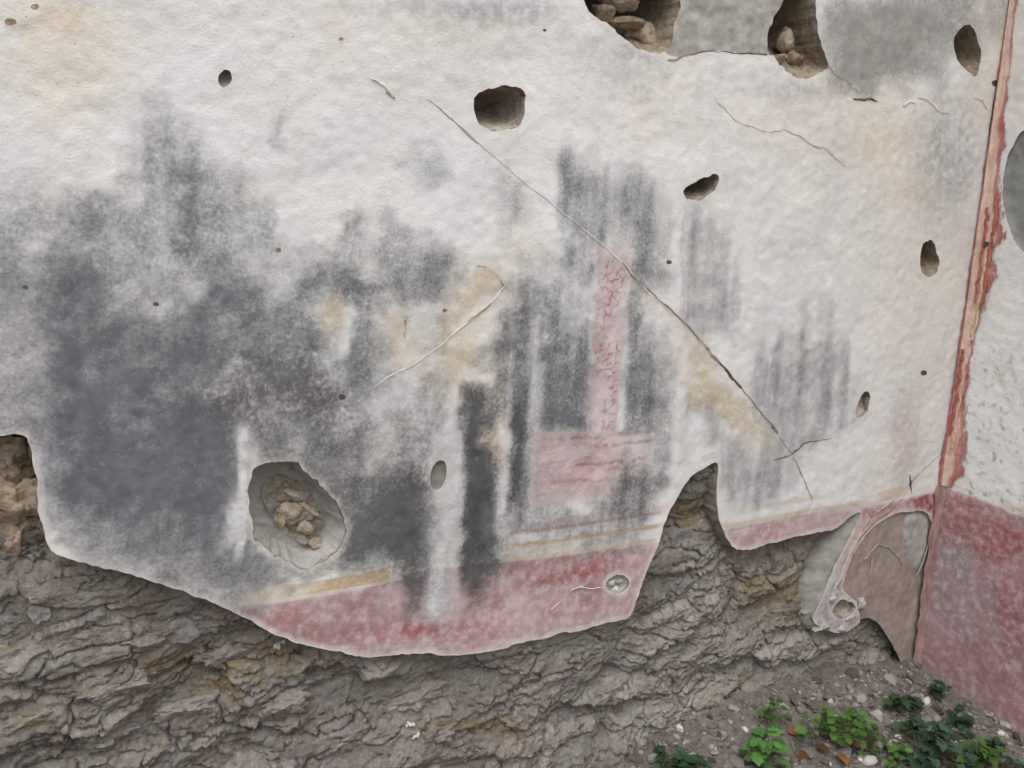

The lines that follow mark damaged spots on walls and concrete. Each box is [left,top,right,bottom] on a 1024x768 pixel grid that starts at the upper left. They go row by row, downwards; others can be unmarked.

crack [372,79,395,99]
peeling [666,0,783,57]
water stain [0,162,500,619]
water stain [495,309,531,376]
water stain [509,387,529,526]
water stain [533,291,588,429]
water stain [602,477,668,528]
crack [427,98,846,499]
water stain [626,352,667,430]
peeling [843,0,1018,664]
spalling [0,434,894,768]